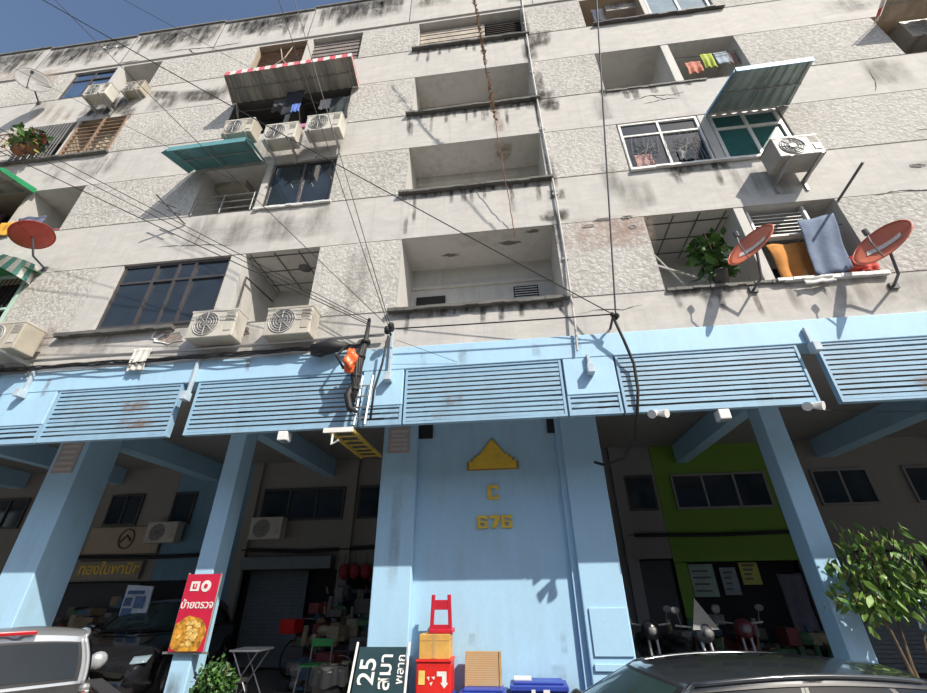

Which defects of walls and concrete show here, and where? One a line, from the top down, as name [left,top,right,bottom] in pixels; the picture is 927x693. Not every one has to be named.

leakage [321,0,403,23]
leakage [139,15,308,48]